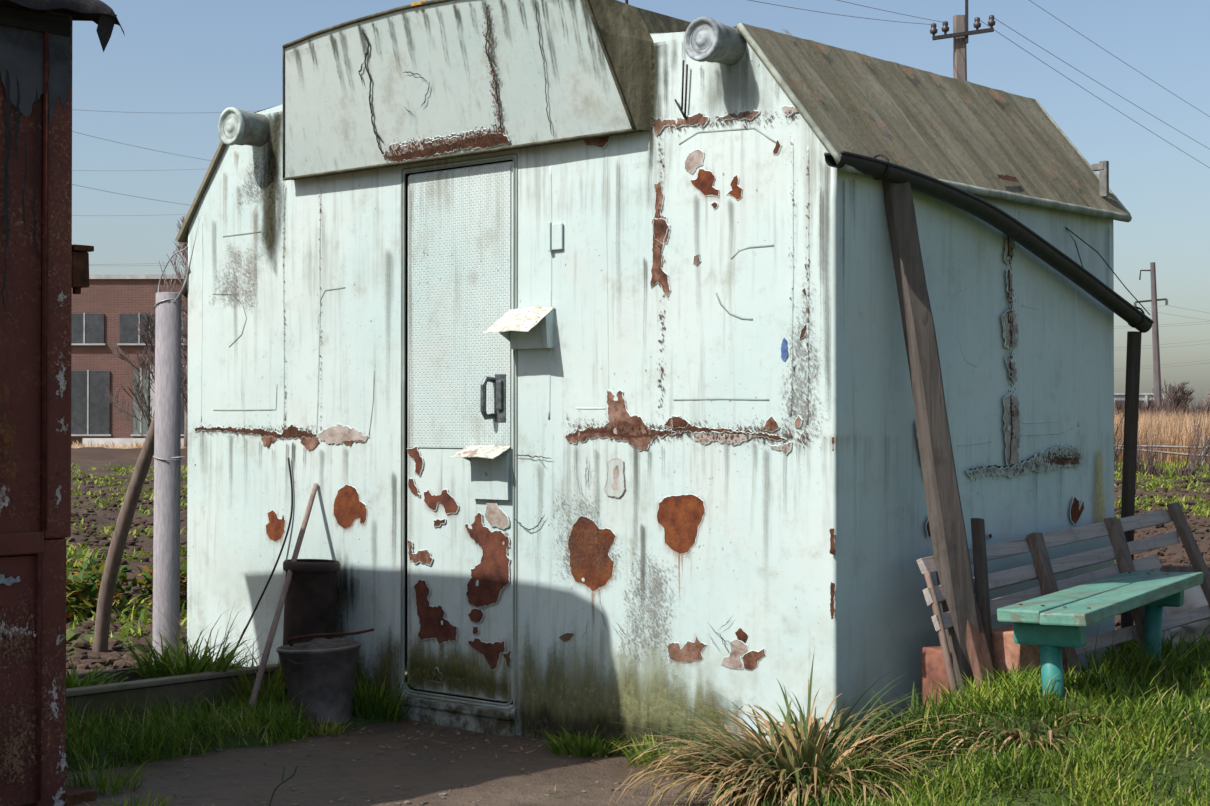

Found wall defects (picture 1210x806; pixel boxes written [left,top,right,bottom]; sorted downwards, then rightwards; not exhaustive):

damp [358,13,411,59]
damp [453,0,505,25]
damp [518,0,602,69]
crack [358,32,385,159]
damp [254,111,284,277]
peeling [966,235,1083,484]
rust [333,484,368,529]
rust [407,446,512,671]
rust [568,515,617,604]
rust [656,493,706,558]
peeling [0,678,60,795]
peeling [52,746,68,806]